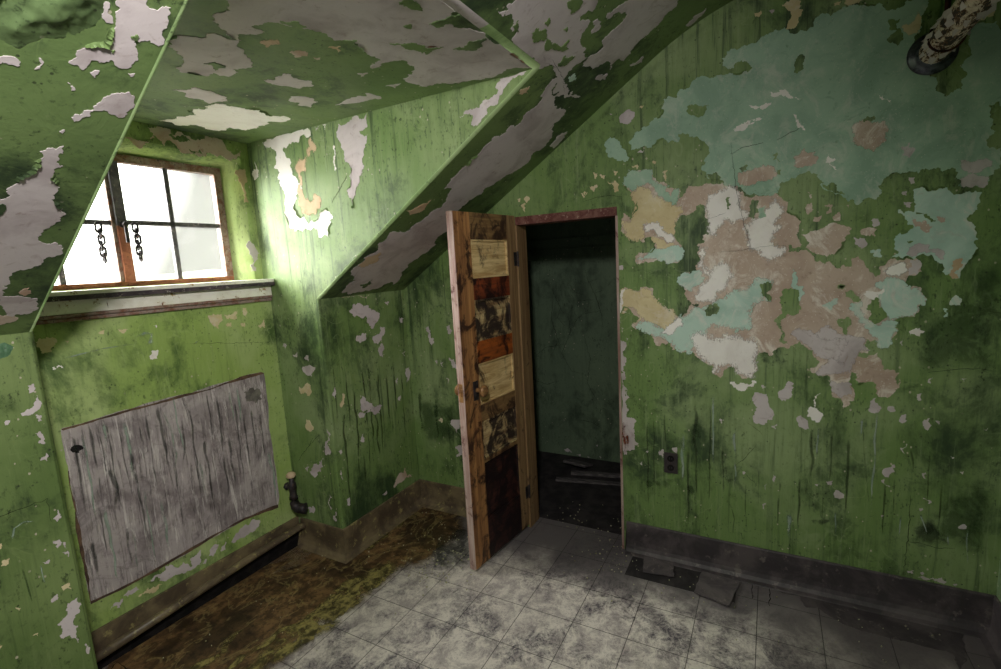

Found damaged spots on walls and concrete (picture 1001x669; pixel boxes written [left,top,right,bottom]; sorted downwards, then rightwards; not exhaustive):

peeling [0,55,21,66]
peeling [69,0,678,357]
peeling [0,146,66,325]
peeling [581,0,1001,465]
leakage [335,377,403,459]
peeling [881,465,895,487]
peeling [625,556,701,592]